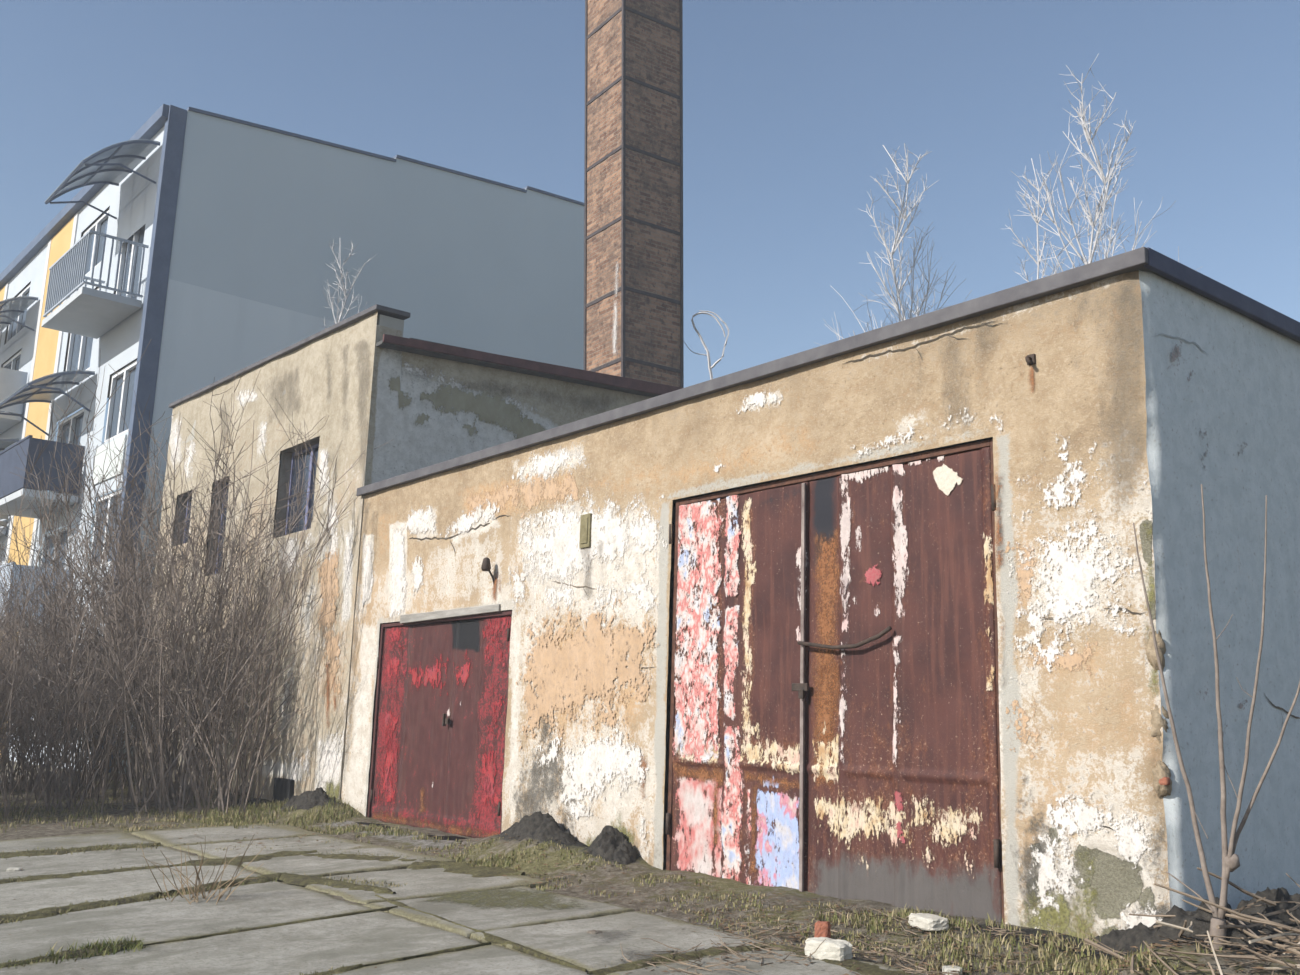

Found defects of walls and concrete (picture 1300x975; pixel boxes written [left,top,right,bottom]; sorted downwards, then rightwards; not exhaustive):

crack [844,321,1006,364]
flaking render [277,449,374,707]
crack [409,515,510,552]
flaking render [375,363,1005,889]
rust [814,530,839,785]
peeling [982,434,1155,759]
peeling [285,725,345,800]
rust [675,764,723,844]
rust [745,773,800,872]
water stain [1018,818,1068,924]
spalling [1019,787,1162,936]